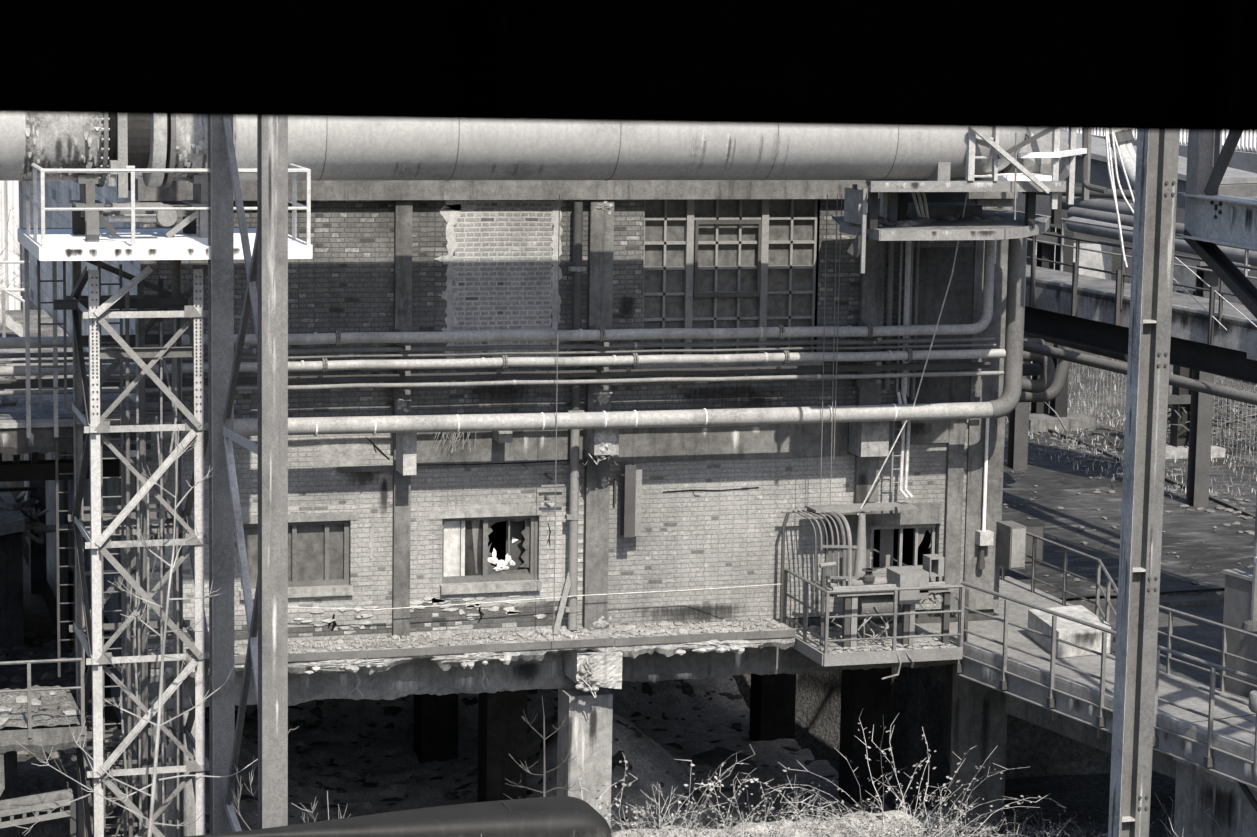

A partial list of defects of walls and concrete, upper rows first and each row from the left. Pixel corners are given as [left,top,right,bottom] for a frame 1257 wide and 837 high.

spalling [302,658,396,675]
spalling [431,651,512,670]
spalling [575,656,599,698]